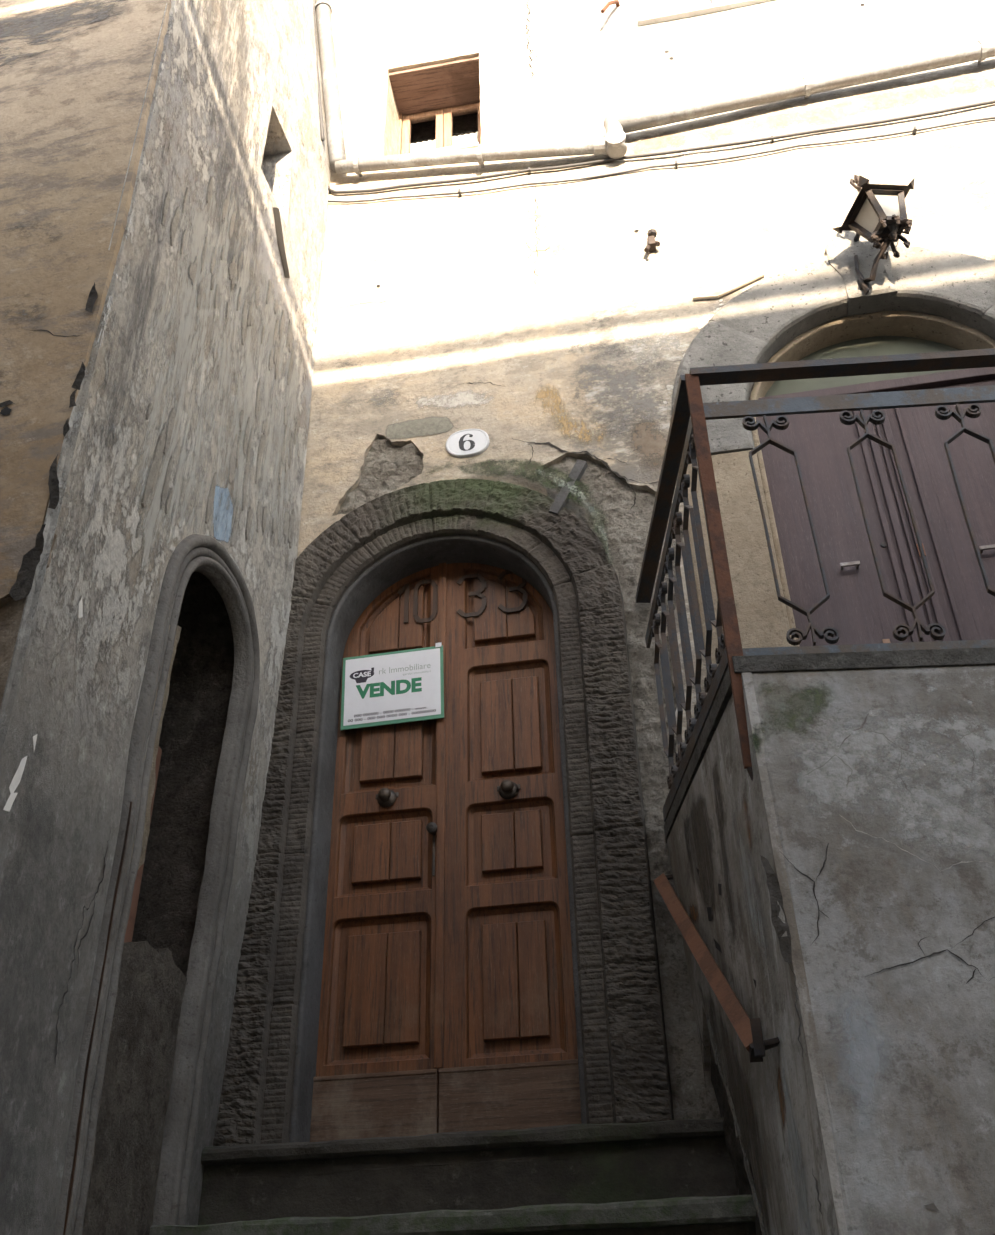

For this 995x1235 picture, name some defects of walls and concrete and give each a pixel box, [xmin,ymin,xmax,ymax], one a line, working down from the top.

damp [0,0,126,67]
crack [520,0,550,294]
spalling [63,362,85,436]
spalling [48,452,59,509]
spalling [336,439,424,515]
damp [538,469,607,540]
spalling [0,524,57,707]
spalling [543,455,749,1168]
crack [784,843,829,941]
crack [865,917,995,984]
crack [787,961,804,1060]
crack [812,1168,822,1214]